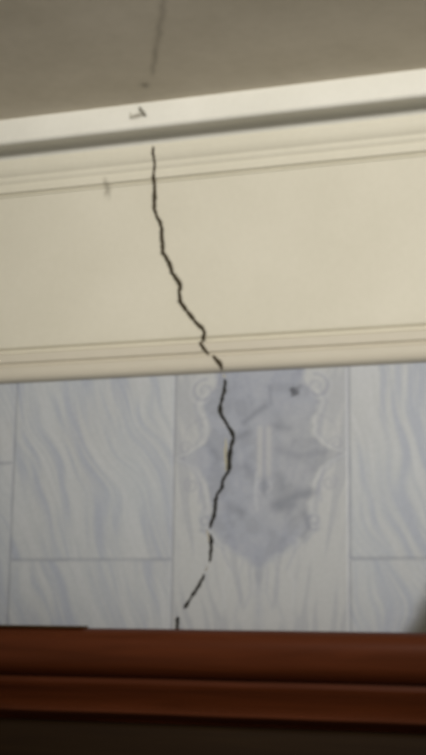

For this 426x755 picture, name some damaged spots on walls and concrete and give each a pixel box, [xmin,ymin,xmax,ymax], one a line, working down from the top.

crack [152,146,235,629]